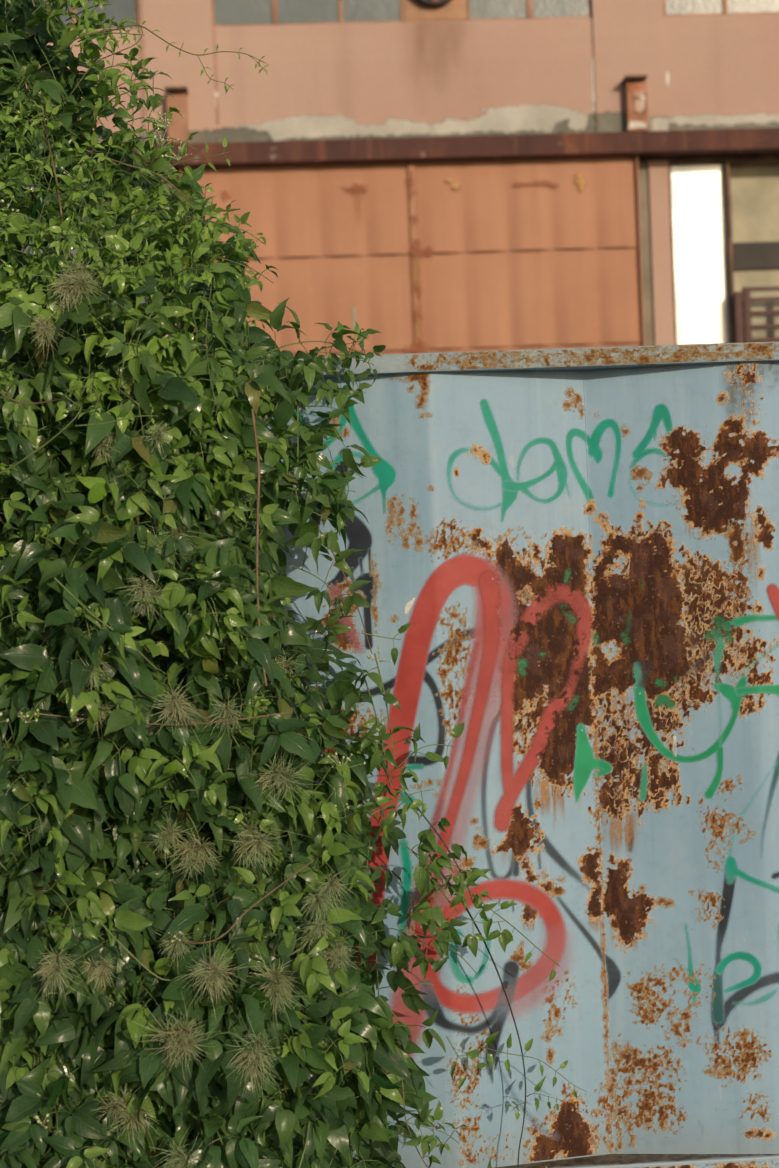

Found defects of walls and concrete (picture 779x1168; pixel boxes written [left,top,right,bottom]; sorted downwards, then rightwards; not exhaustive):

spalling [216,58,596,142]
corrosion [390,239,778,418]
corrosion [341,703,385,738]
corrosion [386,388,779,1166]